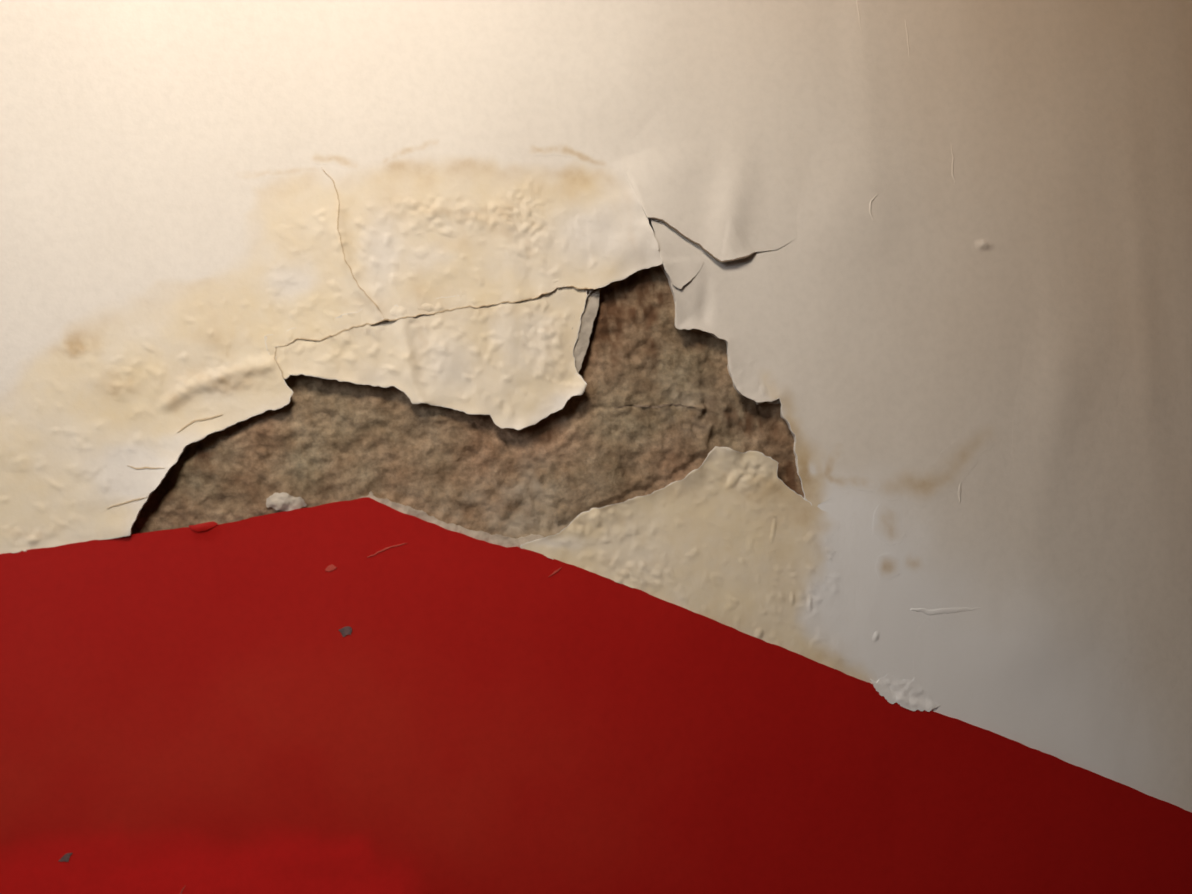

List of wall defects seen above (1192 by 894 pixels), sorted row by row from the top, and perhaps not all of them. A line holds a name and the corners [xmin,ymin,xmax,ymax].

damp [0,137,652,554]
crack [274,170,598,379]
spalling [0,78,941,712]
damp [521,366,1001,684]